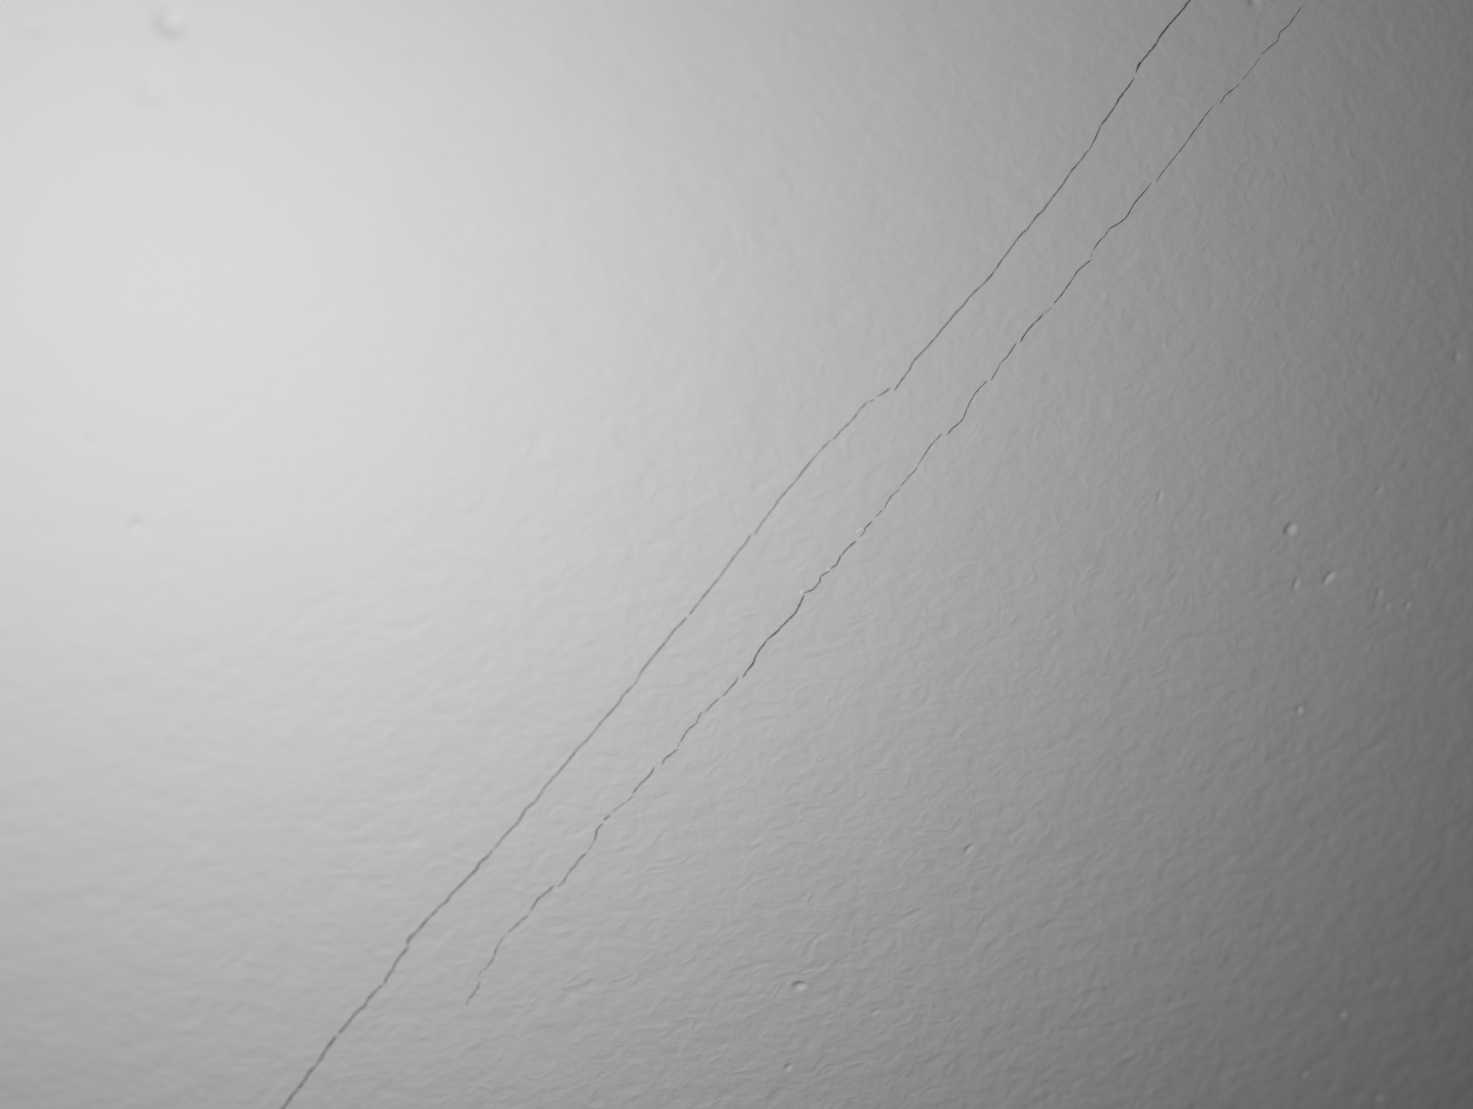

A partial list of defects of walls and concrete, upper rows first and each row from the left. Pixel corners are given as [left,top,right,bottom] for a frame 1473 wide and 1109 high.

crack [282,0,1302,1109]